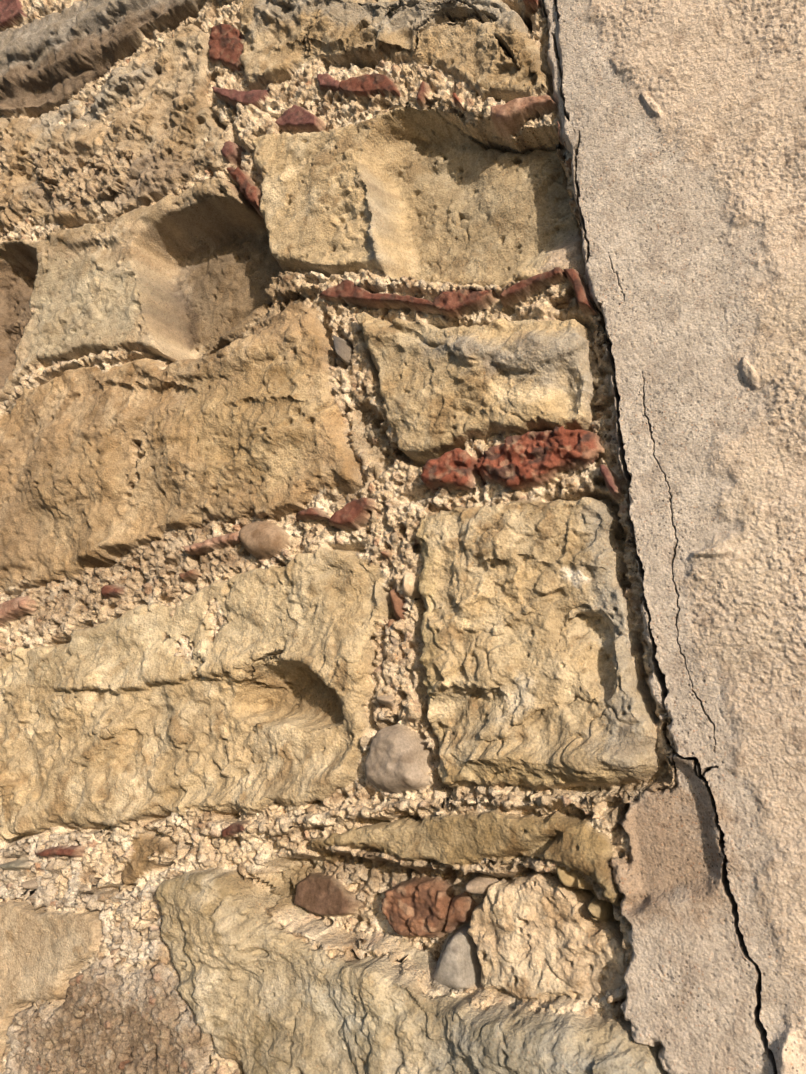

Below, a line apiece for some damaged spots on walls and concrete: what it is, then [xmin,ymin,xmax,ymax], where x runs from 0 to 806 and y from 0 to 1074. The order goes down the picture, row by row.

crack [542,0,777,1074]